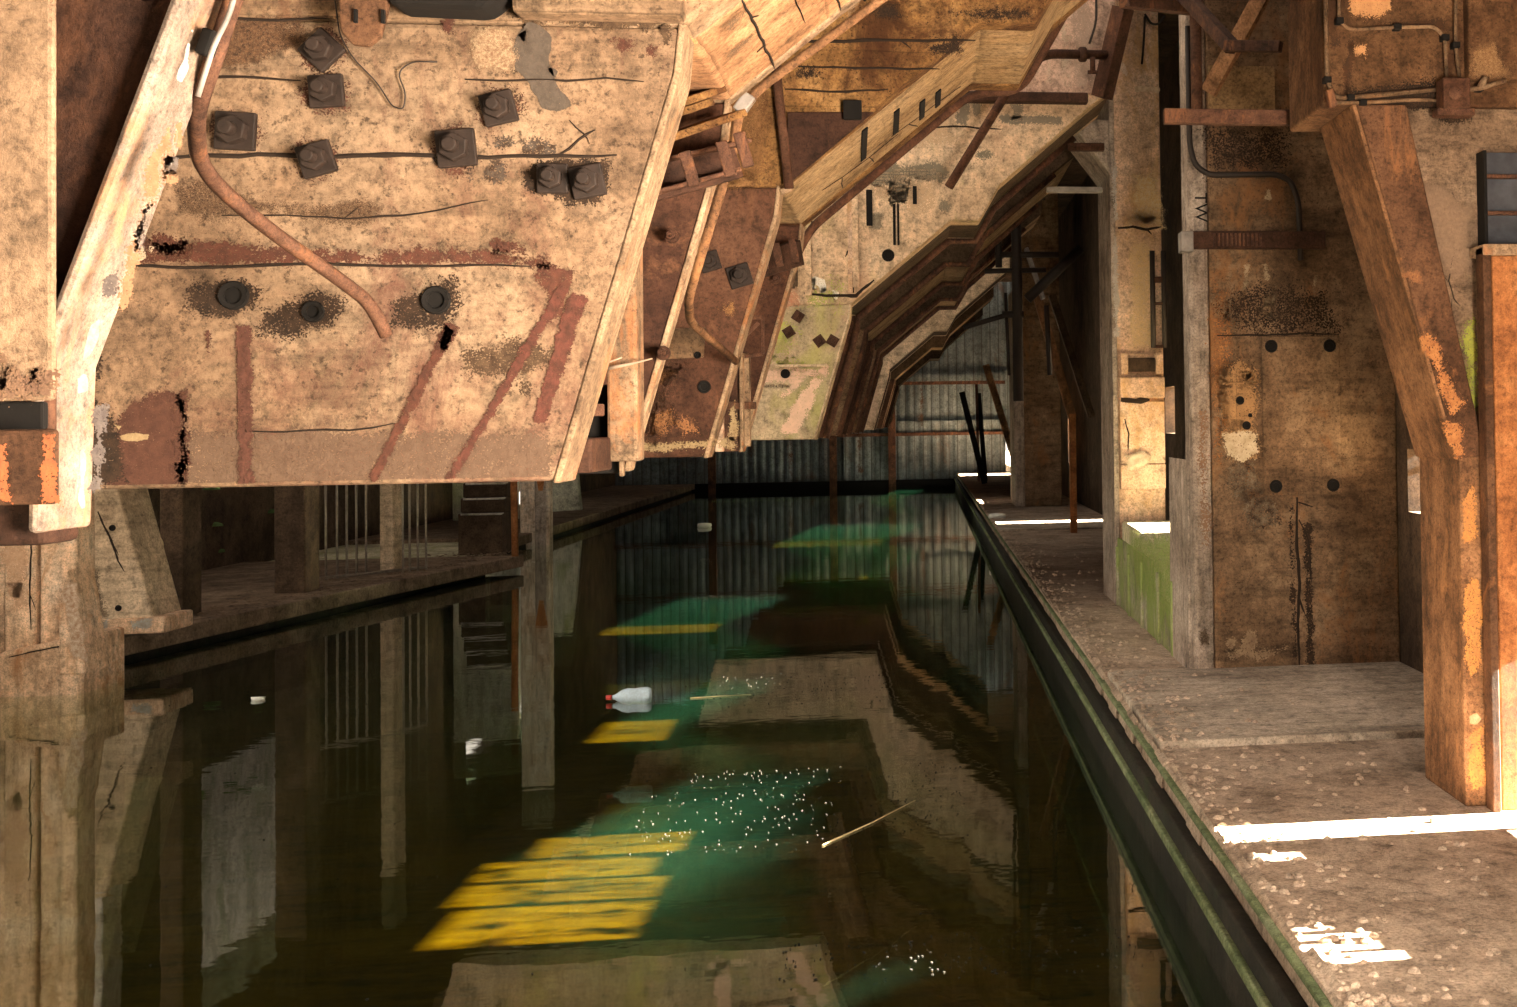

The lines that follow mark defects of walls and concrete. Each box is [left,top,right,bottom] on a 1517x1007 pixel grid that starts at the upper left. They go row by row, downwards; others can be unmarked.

corrosion [289,21,359,192]
water stain [163,154,181,175]
water stain [132,202,153,256]
water stain [181,271,349,345]
water stain [387,272,469,337]
corrosion [137,230,588,484]
water stain [455,332,571,398]
corrosion [646,359,699,439]
corrosion [0,443,14,505]
corrosion [38,432,64,507]
water stain [87,400,137,494]
water stain [167,419,555,484]